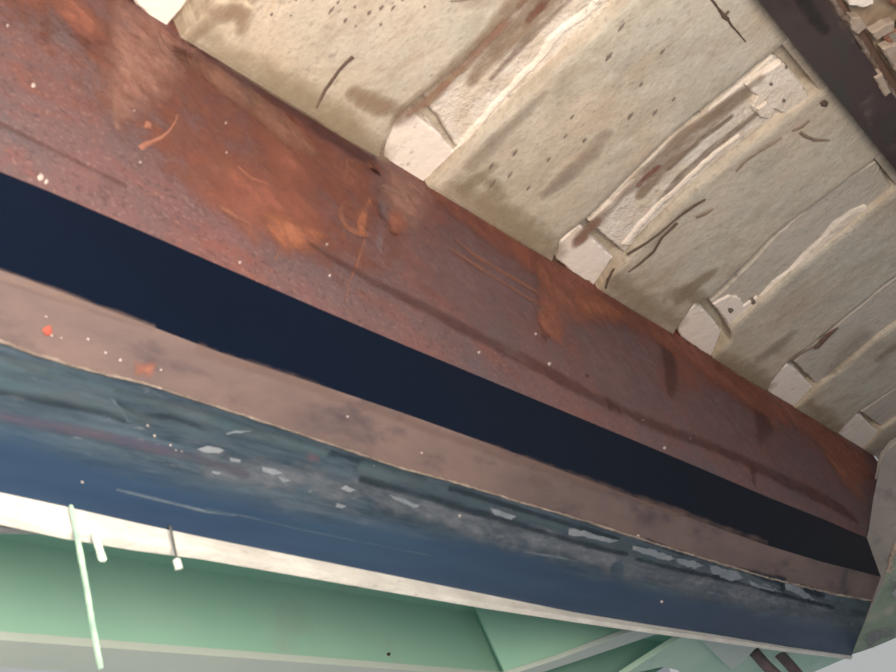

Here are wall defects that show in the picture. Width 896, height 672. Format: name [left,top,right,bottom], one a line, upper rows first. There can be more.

corrosion [0,272,76,302]
corrosion [200,4,249,33]
corrosion [174,48,374,185]
crack [316,55,354,108]
corrosion [395,0,562,123]
corrosion [435,192,874,493]
crack [605,199,714,289]
corrosion [574,76,762,246]
spalling [621,134,740,245]
spalling [743,58,808,118]
crack [735,100,830,172]
peeling [0,356,835,614]